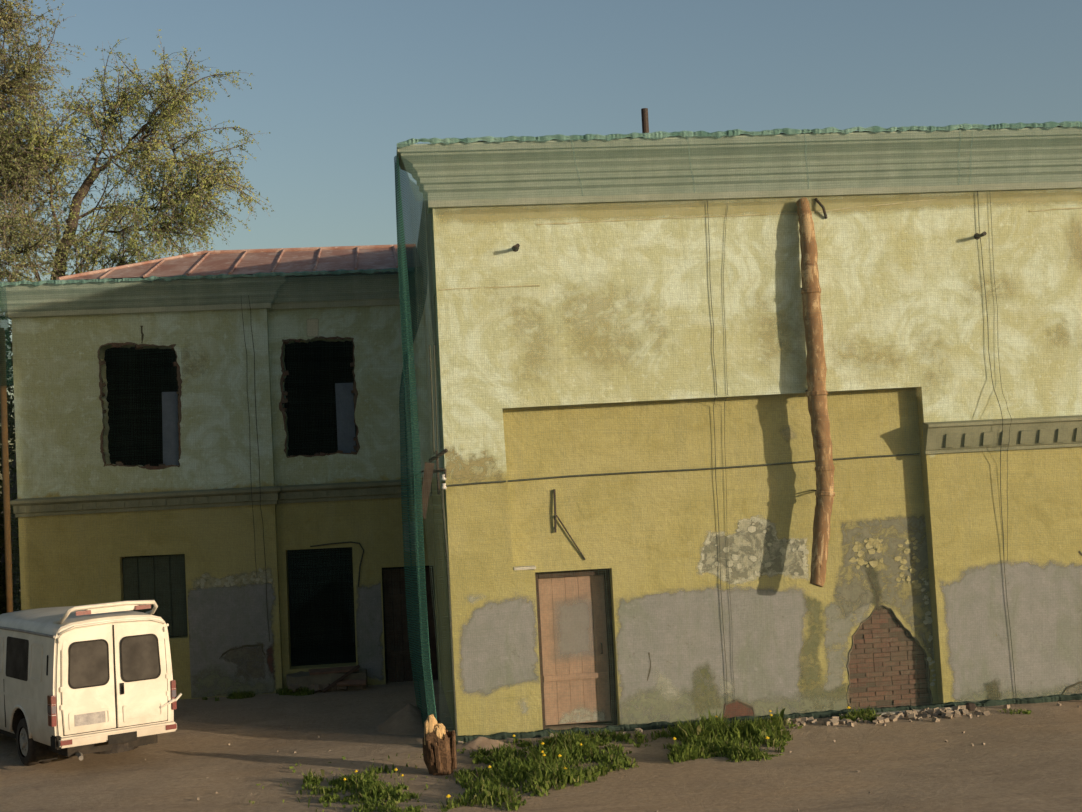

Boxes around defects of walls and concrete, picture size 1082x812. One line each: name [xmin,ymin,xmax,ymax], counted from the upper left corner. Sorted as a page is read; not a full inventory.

peeling [697,515,809,585]
spalling [722,699,754,719]
spalling [846,605,933,710]
spalling [1061,681,1082,695]